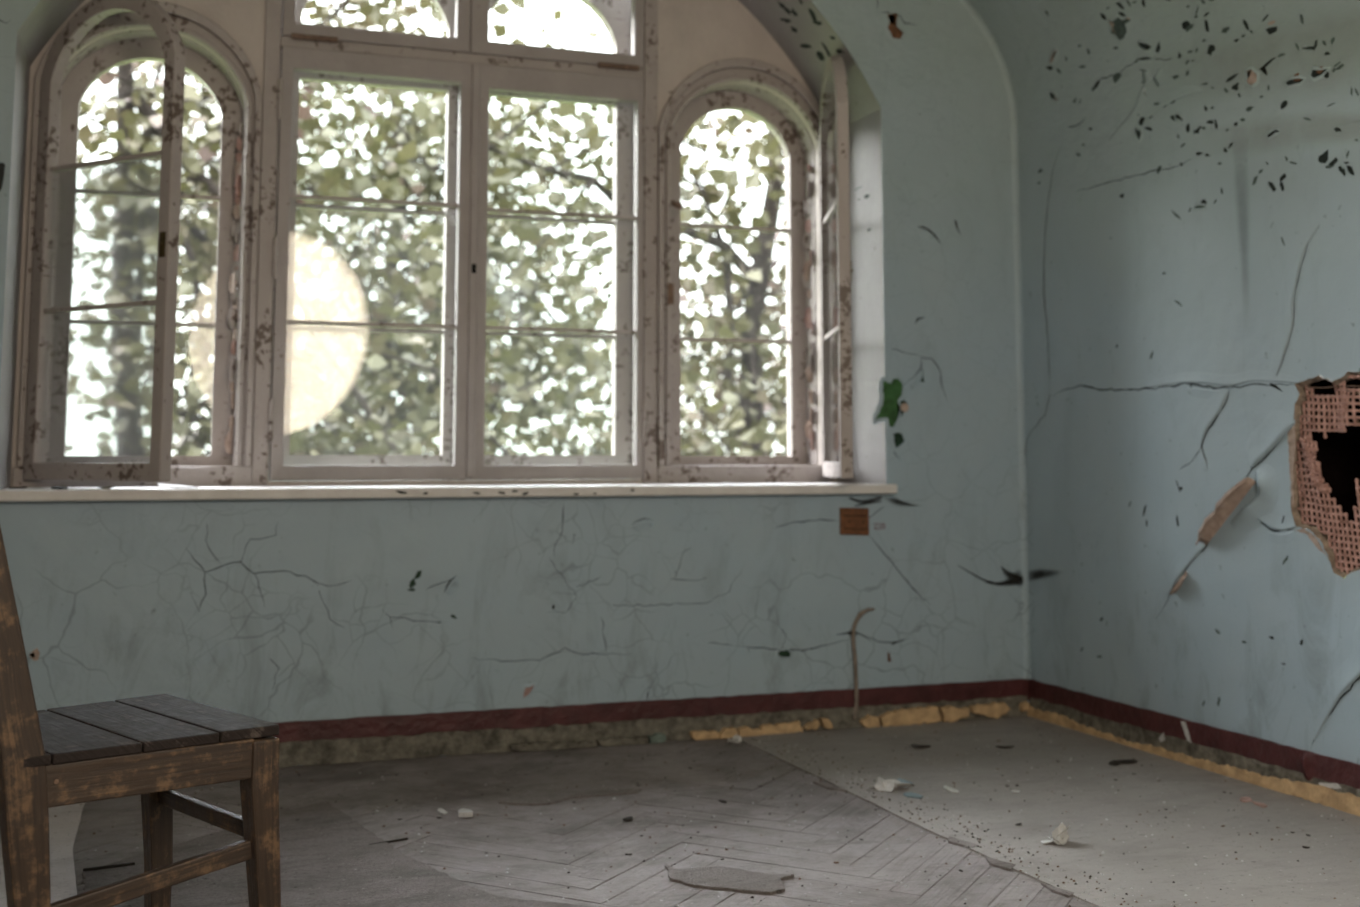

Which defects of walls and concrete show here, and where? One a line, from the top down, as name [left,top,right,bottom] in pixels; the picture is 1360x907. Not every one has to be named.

peeling [1048,73,1122,104]
peeling [1100,0,1161,83]
peeling [1133,0,1344,166]
peeling [1171,188,1223,220]
peeling [1252,156,1297,192]
peeling [1318,127,1358,180]
crack [1025,58,1296,618]
spalling [1288,372,1360,578]
crack [186,524,346,628]
crack [710,629,910,654]
crack [1308,616,1360,744]